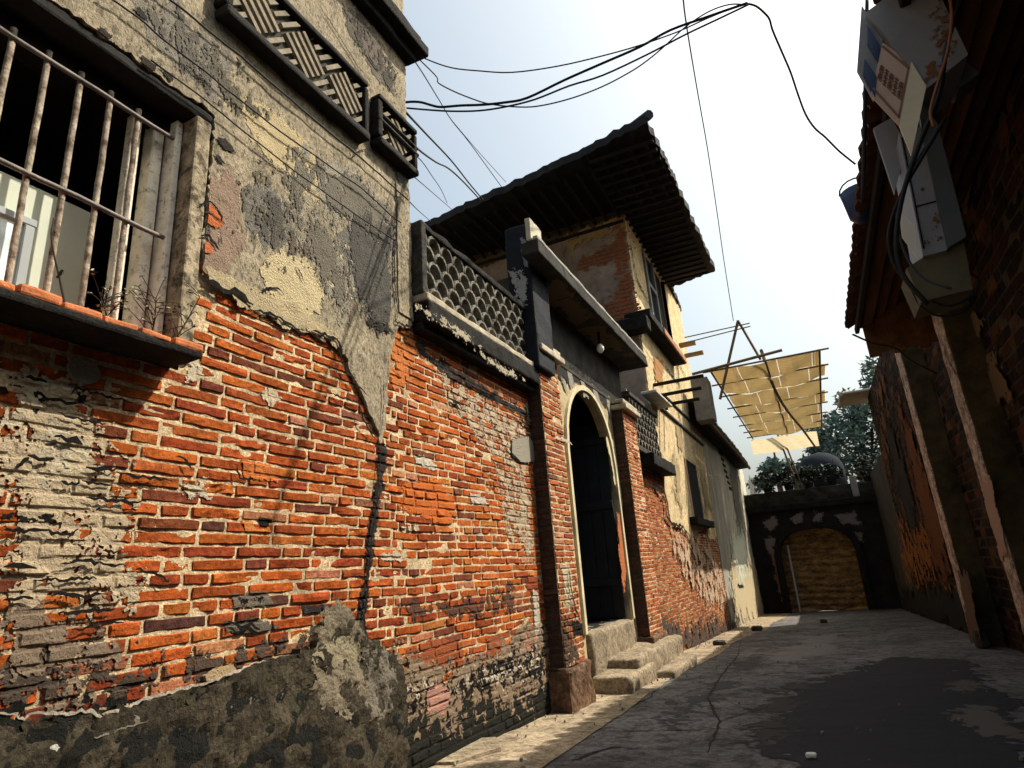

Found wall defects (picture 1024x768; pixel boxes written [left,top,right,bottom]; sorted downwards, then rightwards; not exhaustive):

spalling [215,137,236,164]
peeling [241,94,329,208]
spalling [208,204,224,228]
spalling [577,210,641,321]
peeling [205,247,418,390]
peeling [415,303,525,381]
flaking render [31,374,88,414]
flaking render [0,432,37,496]
crack [204,268,384,627]
spalling [2,512,58,524]
peeling [763,511,863,554]
water stain [0,629,309,713]